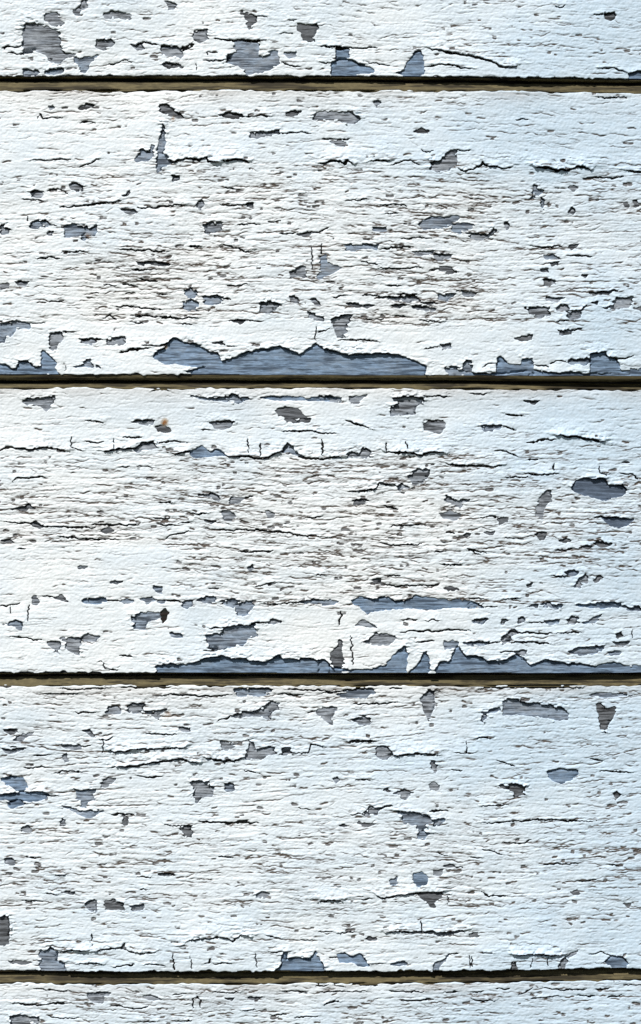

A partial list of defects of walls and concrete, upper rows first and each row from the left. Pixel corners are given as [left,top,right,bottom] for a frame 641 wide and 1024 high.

peeling [2,0,115,76]
peeling [130,10,320,75]
peeling [135,103,185,182]
peeling [217,109,364,139]
peeling [524,254,641,336]
peeling [153,287,641,376]
crack [0,417,187,481]
peeling [93,415,373,461]
peeling [190,391,368,424]
peeling [571,470,634,529]
peeling [82,578,641,673]
peeling [0,770,134,826]